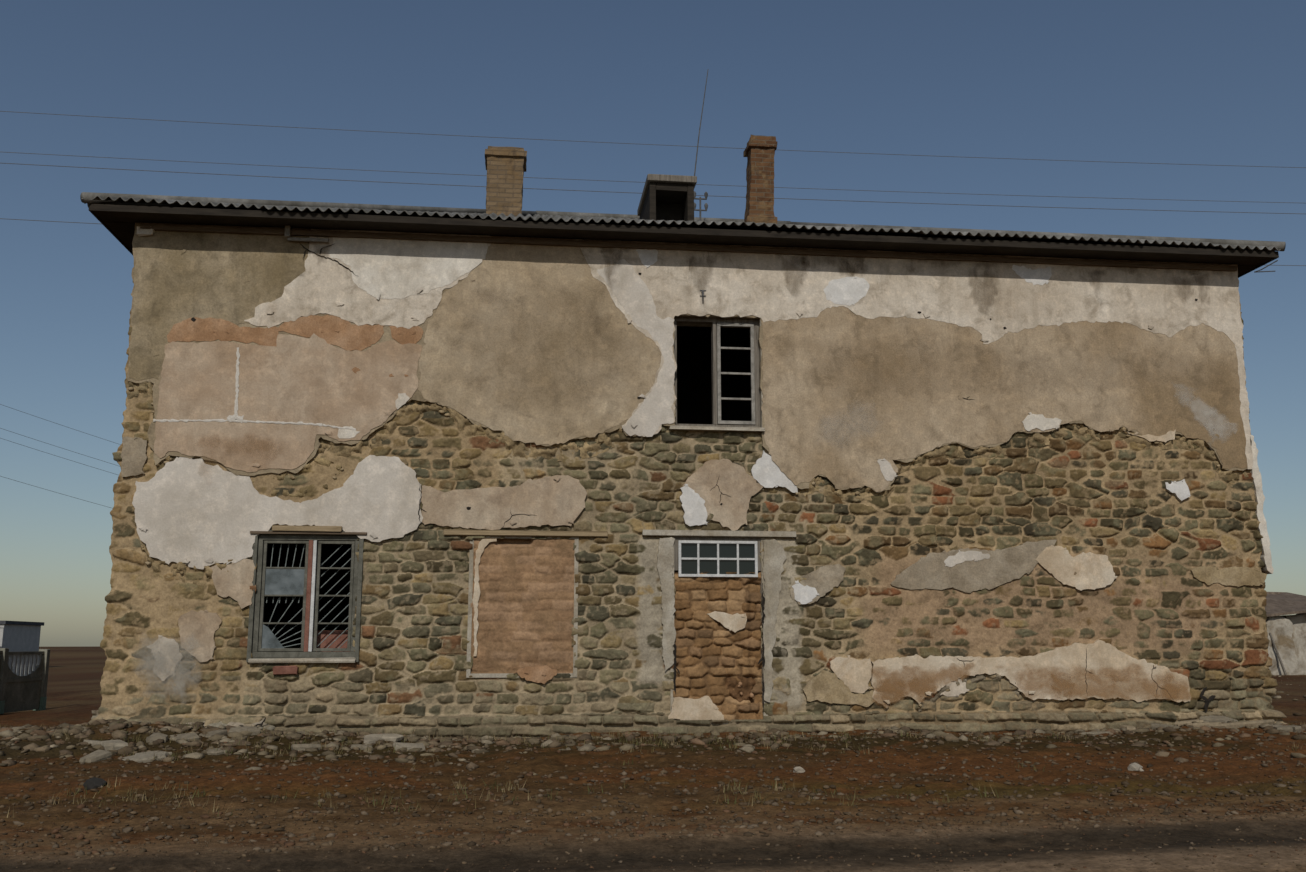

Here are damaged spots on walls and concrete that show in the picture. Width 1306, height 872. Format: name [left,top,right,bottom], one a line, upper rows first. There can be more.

crack [302,244,357,276]
spalling [127,223,1274,609]
flaking render [147,610,222,681]
spalling [516,665,557,684]
flaking render [708,611,747,632]
flaking render [802,640,1191,711]